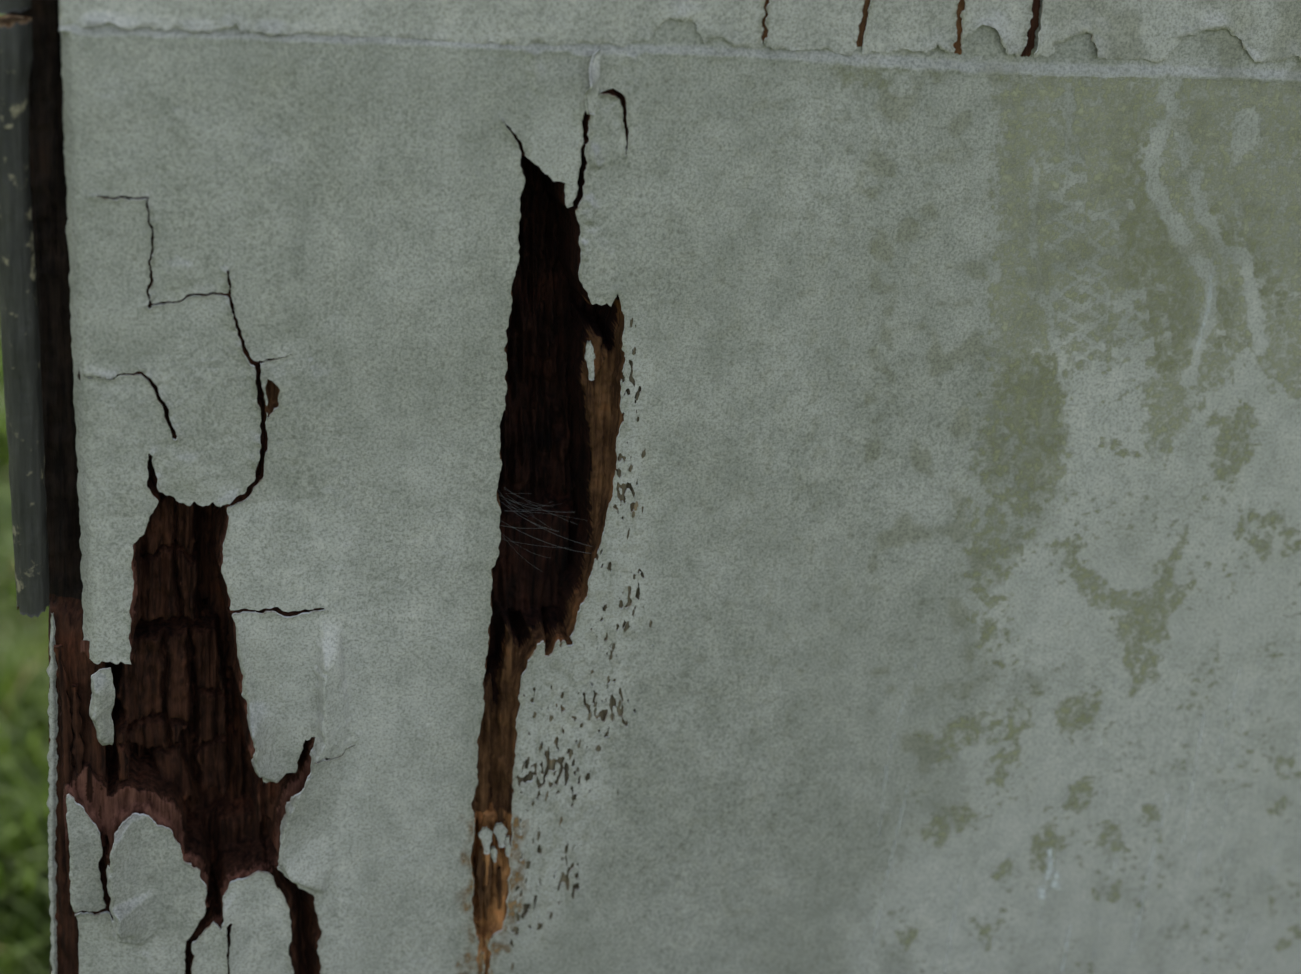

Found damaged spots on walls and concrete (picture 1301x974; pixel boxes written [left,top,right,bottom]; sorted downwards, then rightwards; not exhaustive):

crack [761,0,769,41]
crack [856,0,870,47]
peeling [637,0,1102,59]
crack [953,0,965,55]
crack [1020,0,1040,57]
peeling [1147,3,1265,63]
crack [100,195,286,507]
crack [78,369,177,502]
spalling [478,50,652,971]
peeling [66,611,335,974]